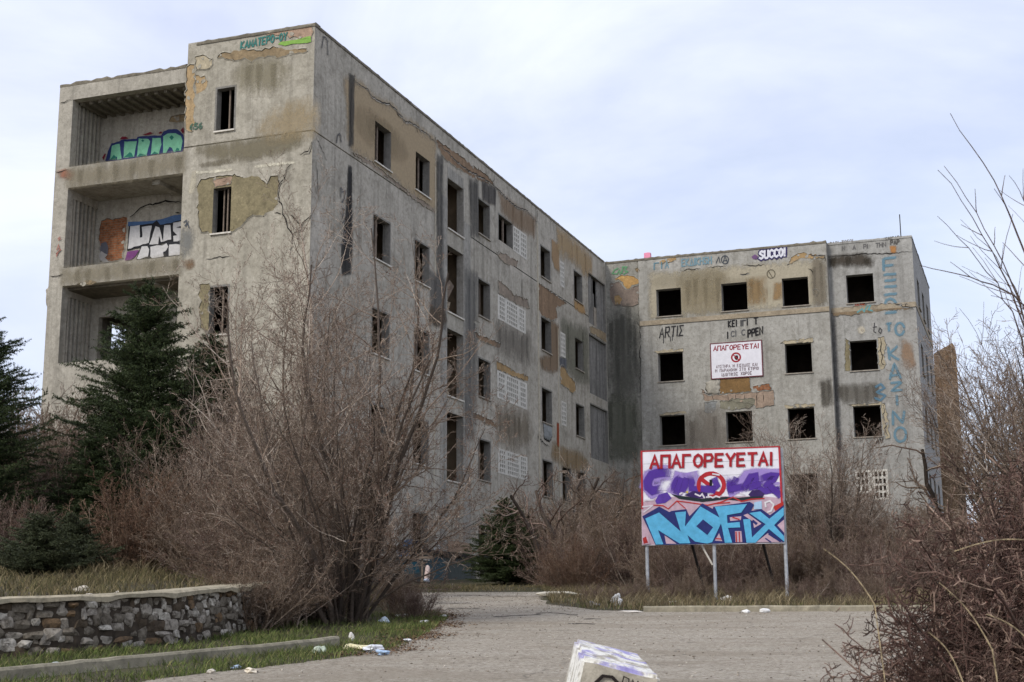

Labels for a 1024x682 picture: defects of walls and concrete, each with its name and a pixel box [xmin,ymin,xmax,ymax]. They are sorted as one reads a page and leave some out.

spalling [169,26,314,133]
spalling [196,173,281,238]
crack [275,140,325,255]
spalling [98,216,127,263]
spalling [787,252,826,265]
spalling [198,283,211,331]
spalling [498,280,567,322]
flaking render [609,268,640,307]
spalling [877,335,887,369]
leakage [607,307,641,460]
spalling [701,377,815,413]